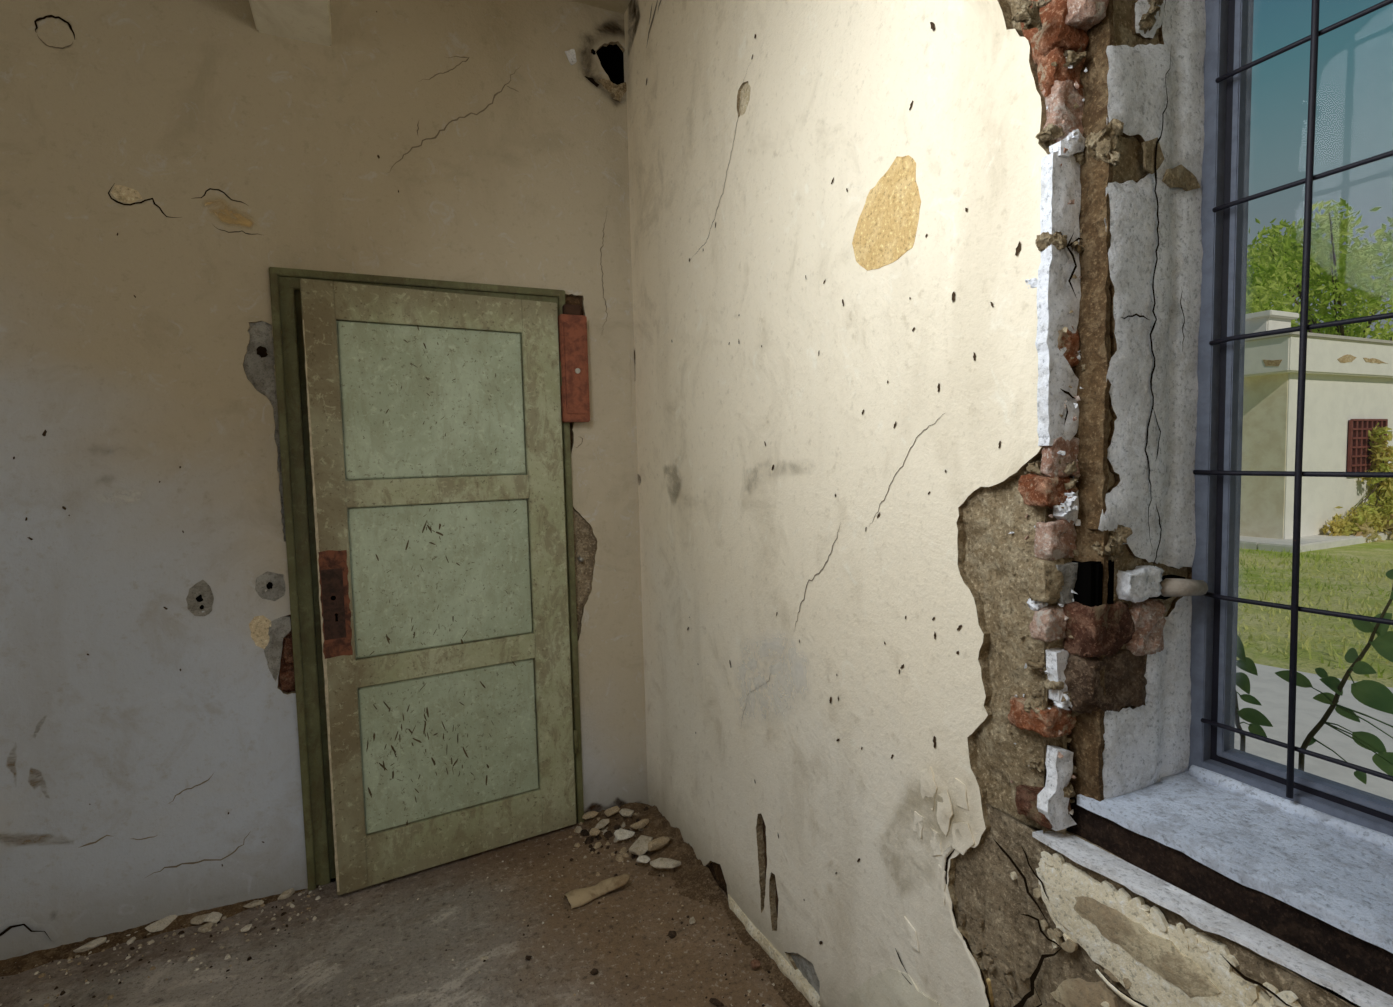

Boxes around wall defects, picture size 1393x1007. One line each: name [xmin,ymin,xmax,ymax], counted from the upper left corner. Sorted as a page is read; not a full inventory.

crack [386,65,521,174]
spalling [565,44,627,102]
crack [1121,54,1185,567]
crack [872,413,945,522]
spalling [913,0,1355,1007]
spalling [573,508,596,637]
crack [795,527,840,625]
spalling [278,615,295,693]
crack [79,832,250,877]
crack [941,840,1062,1007]
crack [1096,969,1148,1007]
crack [1223,957,1292,1007]